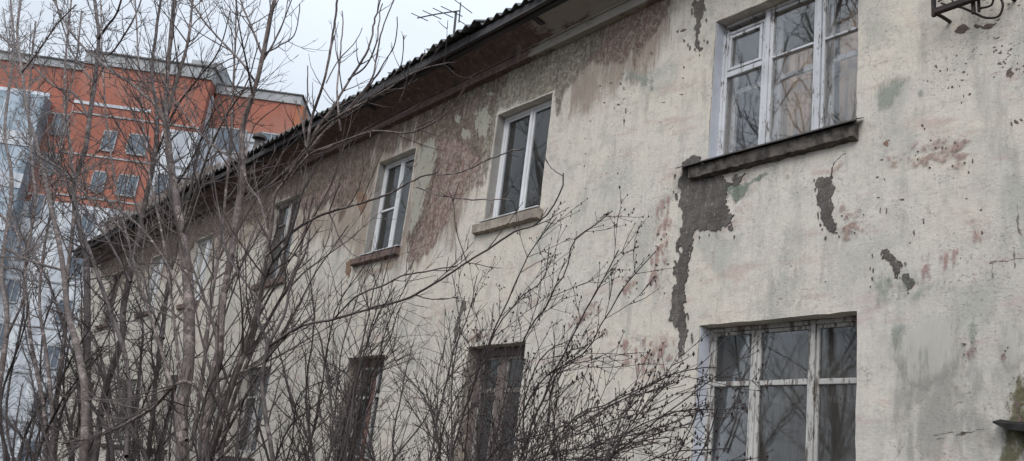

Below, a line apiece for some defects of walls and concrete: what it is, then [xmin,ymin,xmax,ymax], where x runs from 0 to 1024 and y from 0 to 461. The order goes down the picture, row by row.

spalling [677,0,709,57]
damp [99,0,670,288]
spalling [814,175,868,241]
spalling [618,155,745,374]
spalling [869,249,961,294]